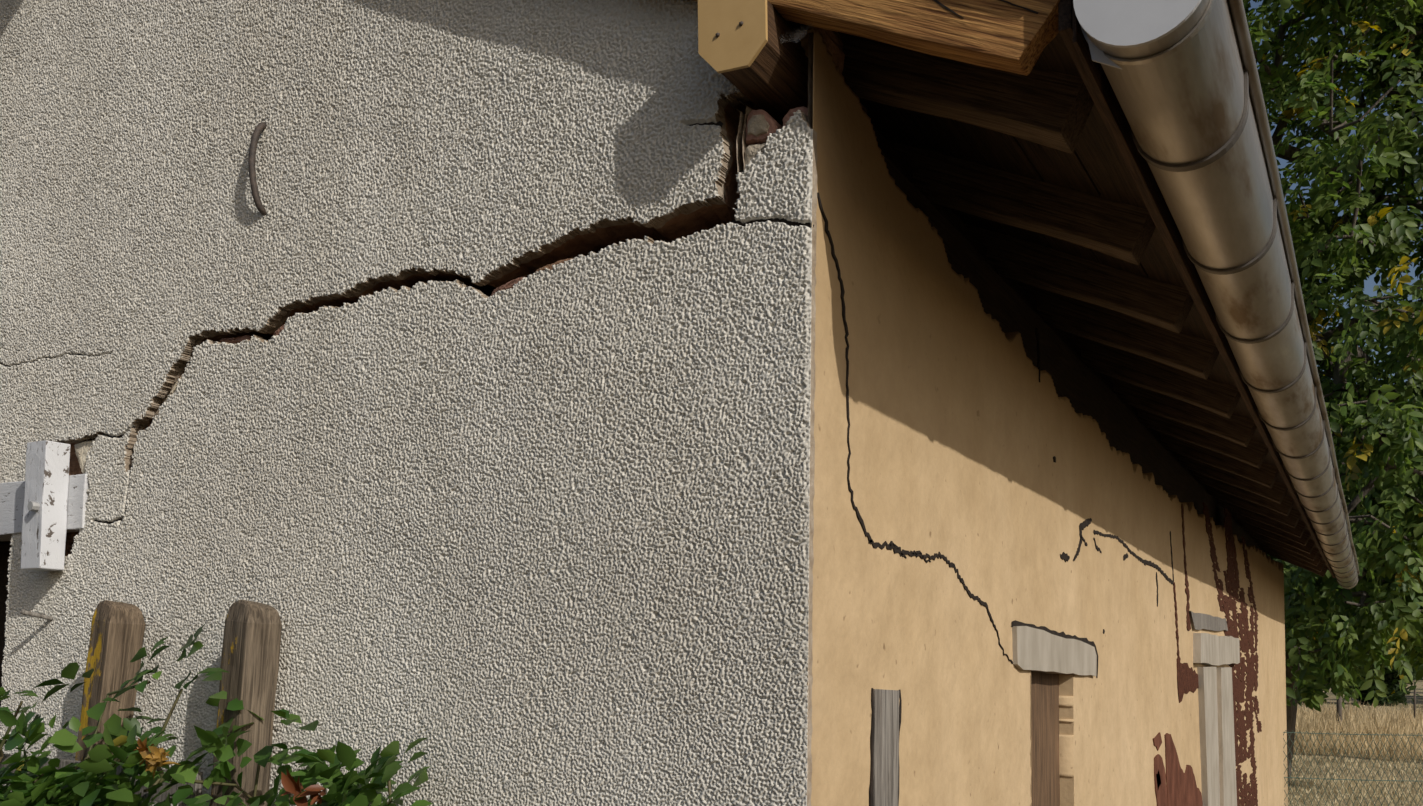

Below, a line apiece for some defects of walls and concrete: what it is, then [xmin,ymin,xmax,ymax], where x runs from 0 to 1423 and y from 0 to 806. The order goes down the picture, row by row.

crack [95,98,1013,664]
crack [1060,518,1174,607]
peeling [1176,659,1199,703]
peeling [1153,732,1203,806]